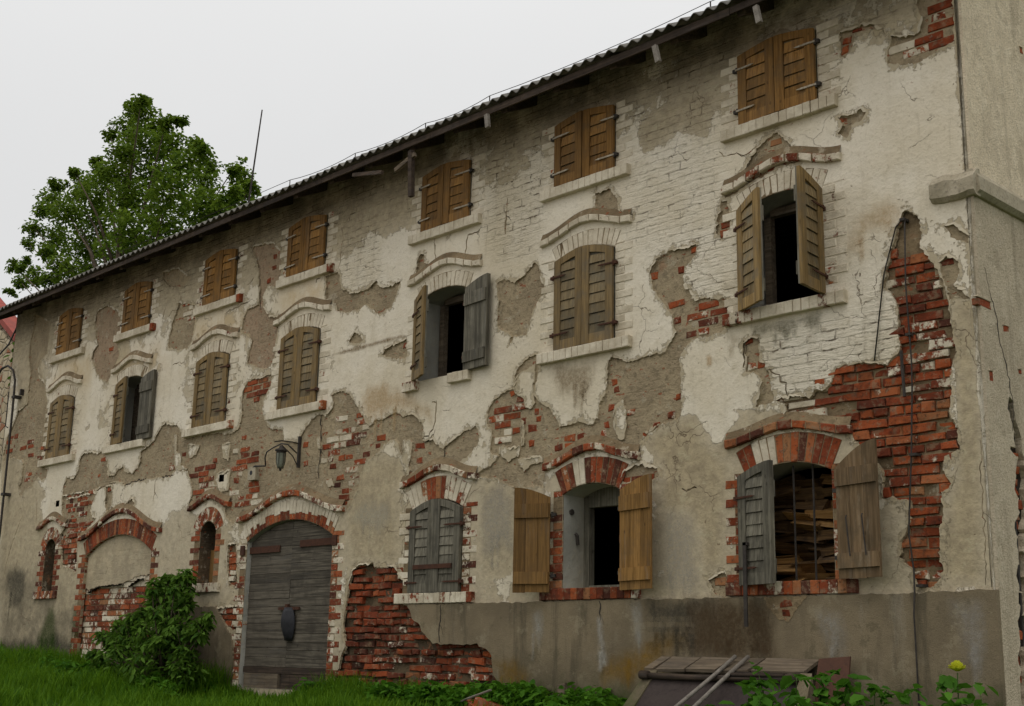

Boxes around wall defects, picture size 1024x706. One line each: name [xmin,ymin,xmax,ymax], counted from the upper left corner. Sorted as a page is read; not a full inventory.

spalling [840,0,954,65]
spalling [744,131,791,170]
spalling [59,241,727,571]
spalling [743,212,991,588]
crack [984,267,1023,535]
spalling [337,563,496,689]
crack [1016,630,1024,683]